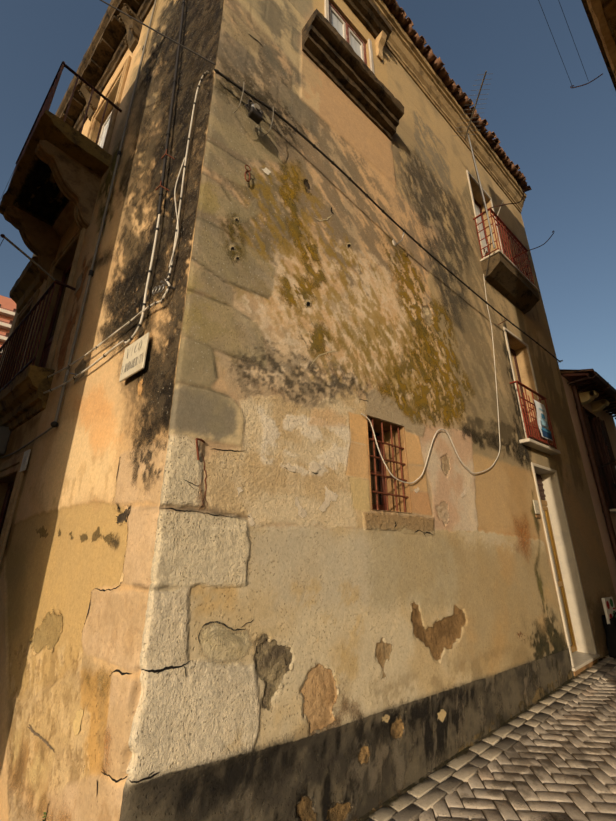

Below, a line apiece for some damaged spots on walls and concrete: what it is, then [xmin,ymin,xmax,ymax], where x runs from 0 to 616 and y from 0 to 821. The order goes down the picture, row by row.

leakage [91,0,303,482]
leakage [405,157,469,328]
leakage [239,347,367,402]
spalling [58,527,112,544]
spalling [115,505,131,526]
spalling [28,609,63,656]
crack [110,620,253,676]
spalling [253,634,293,710]
spalling [300,663,340,734]
spalling [375,638,393,681]
spalling [409,602,466,665]
crack [28,724,55,753]